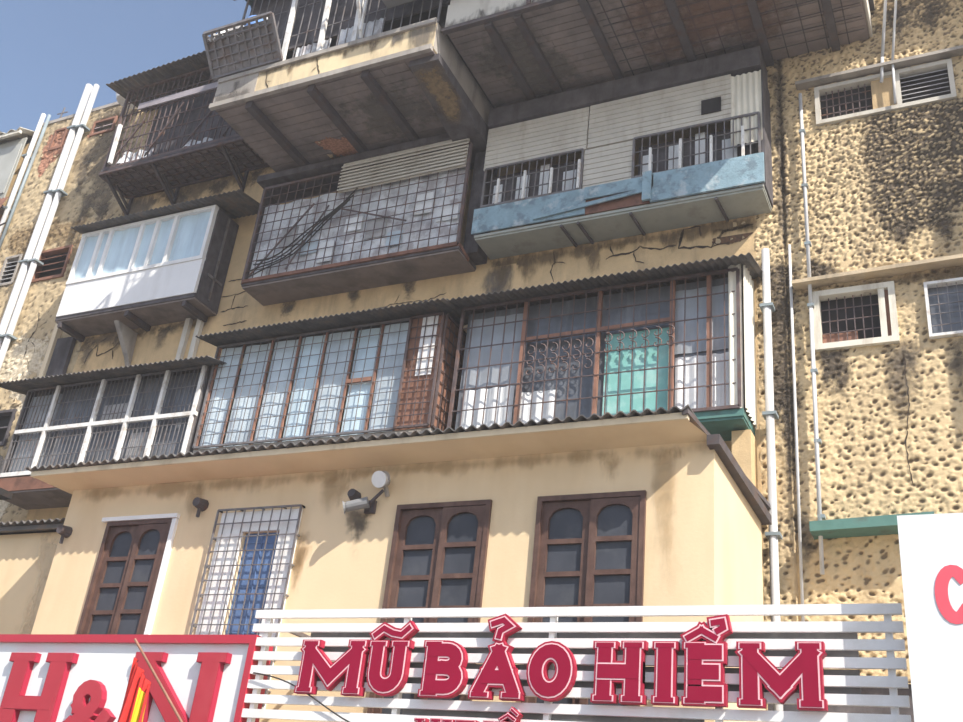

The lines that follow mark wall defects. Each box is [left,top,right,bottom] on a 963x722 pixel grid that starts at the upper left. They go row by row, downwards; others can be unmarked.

water stain [870,0,960,35]
water stain [863,99,963,244]
crack [606,224,753,263]
crack [903,354,913,483]
water stain [348,511,367,539]